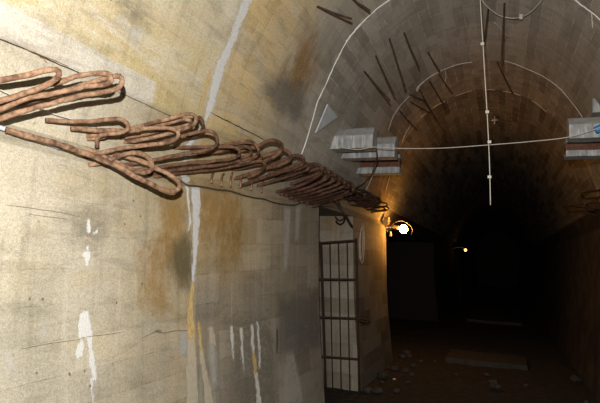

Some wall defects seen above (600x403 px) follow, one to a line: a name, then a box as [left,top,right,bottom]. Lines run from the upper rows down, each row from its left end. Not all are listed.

leakage [175,0,252,403]
crack [22,332,121,349]
crack [142,329,188,338]
leakage [230,321,262,403]